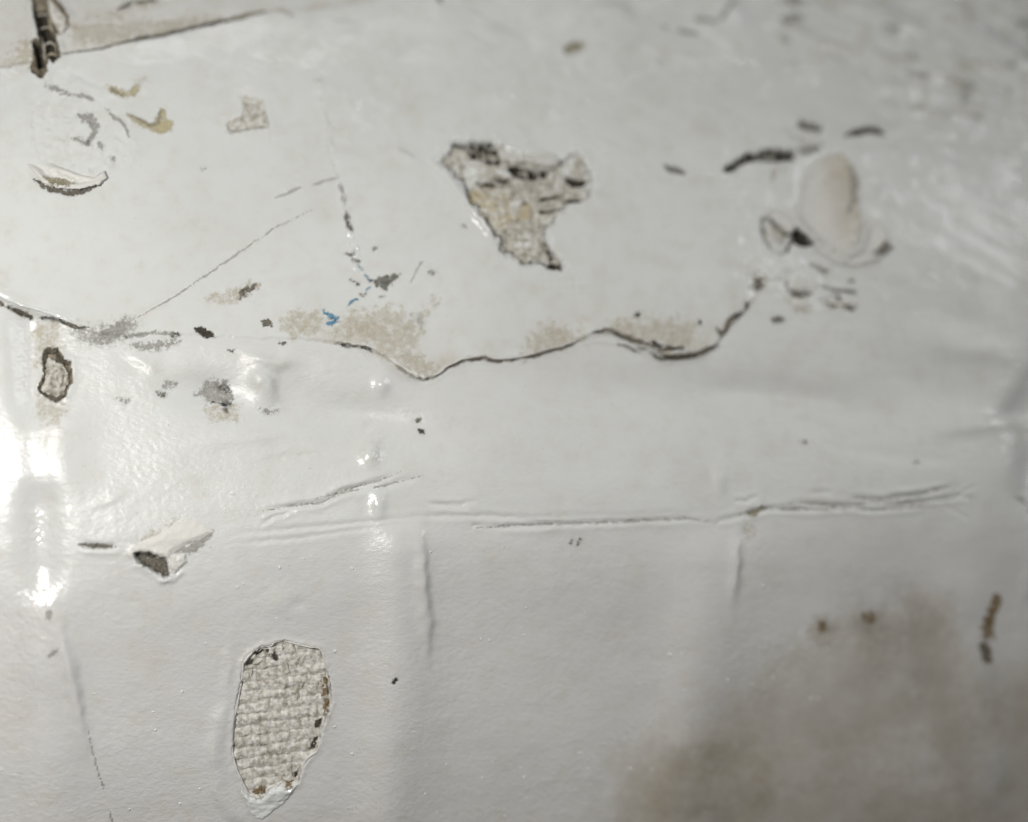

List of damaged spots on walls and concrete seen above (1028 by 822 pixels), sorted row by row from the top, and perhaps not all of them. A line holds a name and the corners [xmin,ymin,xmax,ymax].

spalling [444,154,557,269]
spalling [524,154,589,247]
spalling [761,207,797,254]
crack [268,477,413,510]
crack [477,518,695,528]
crack [740,487,979,517]
peeling [170,553,188,574]
corrosion [980,593,1002,665]
peeling [232,640,332,820]